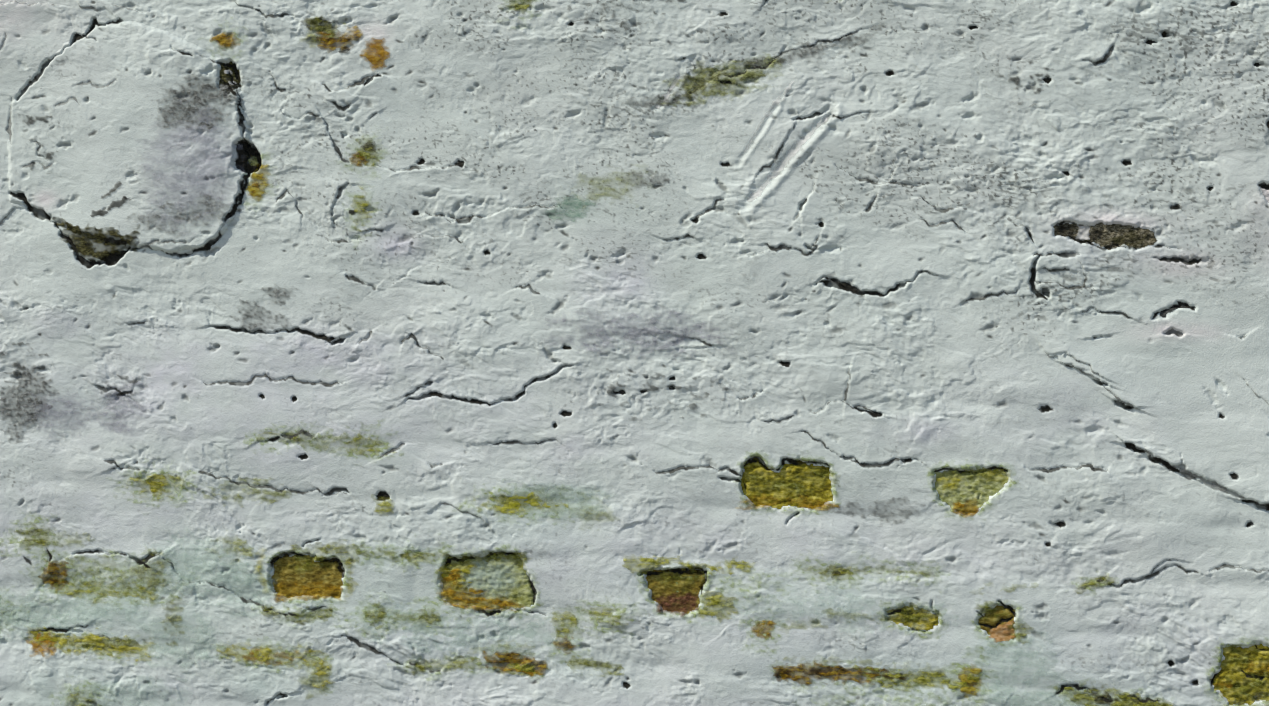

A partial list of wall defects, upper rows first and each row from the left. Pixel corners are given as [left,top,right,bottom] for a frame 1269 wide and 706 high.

crack [754,238,930,297]
spalling [1053,221,1202,265]
crack [212,326,372,345]
crack [204,374,339,387]
crack [401,333,569,406]
crack [487,439,544,447]
spalling [719,453,839,522]
spalling [928,464,1016,516]
spalling [258,539,354,603]
spalling [435,545,542,618]
spalling [623,557,751,622]
spalling [1192,642,1269,706]